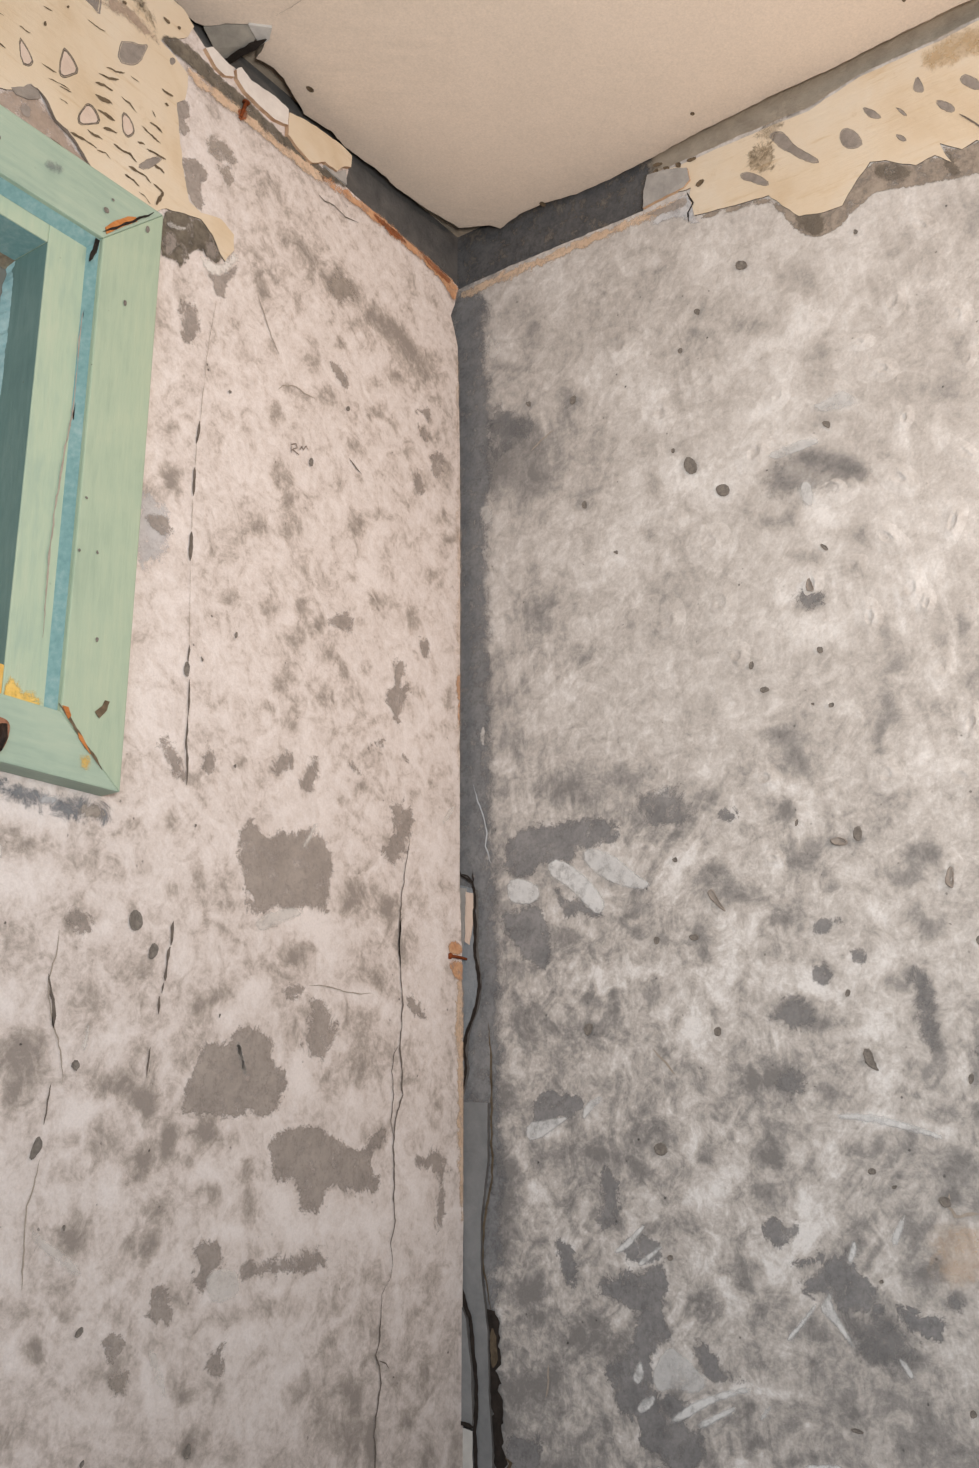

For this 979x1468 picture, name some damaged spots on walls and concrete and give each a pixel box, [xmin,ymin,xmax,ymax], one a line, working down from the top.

peeling [0,0,238,298]
peeling [144,514,173,535]
peeling [161,20,979,1319]
peeling [69,910,94,934]
spalling [129,910,143,931]
spalling [149,943,159,959]
crack [44,936,63,1123]
spalling [29,1137,42,1160]
crack [309,835,411,1468]
crack [21,1160,40,1285]
peeling [146,1285,173,1327]